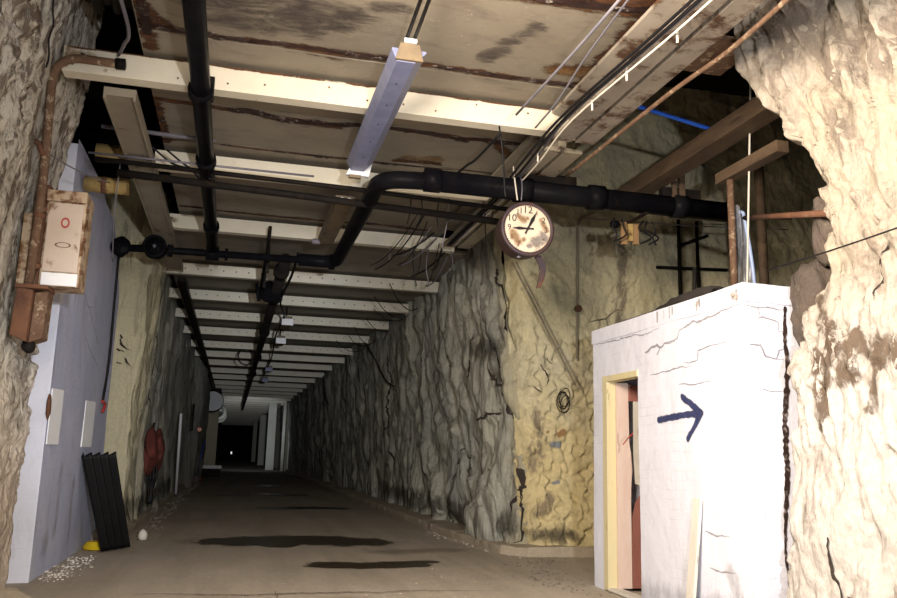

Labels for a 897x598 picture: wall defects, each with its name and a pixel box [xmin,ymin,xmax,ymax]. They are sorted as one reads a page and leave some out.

rust [208,31,388,61]
rust [421,0,657,89]
crack [590,304,790,586]
crack [159,590,350,598]